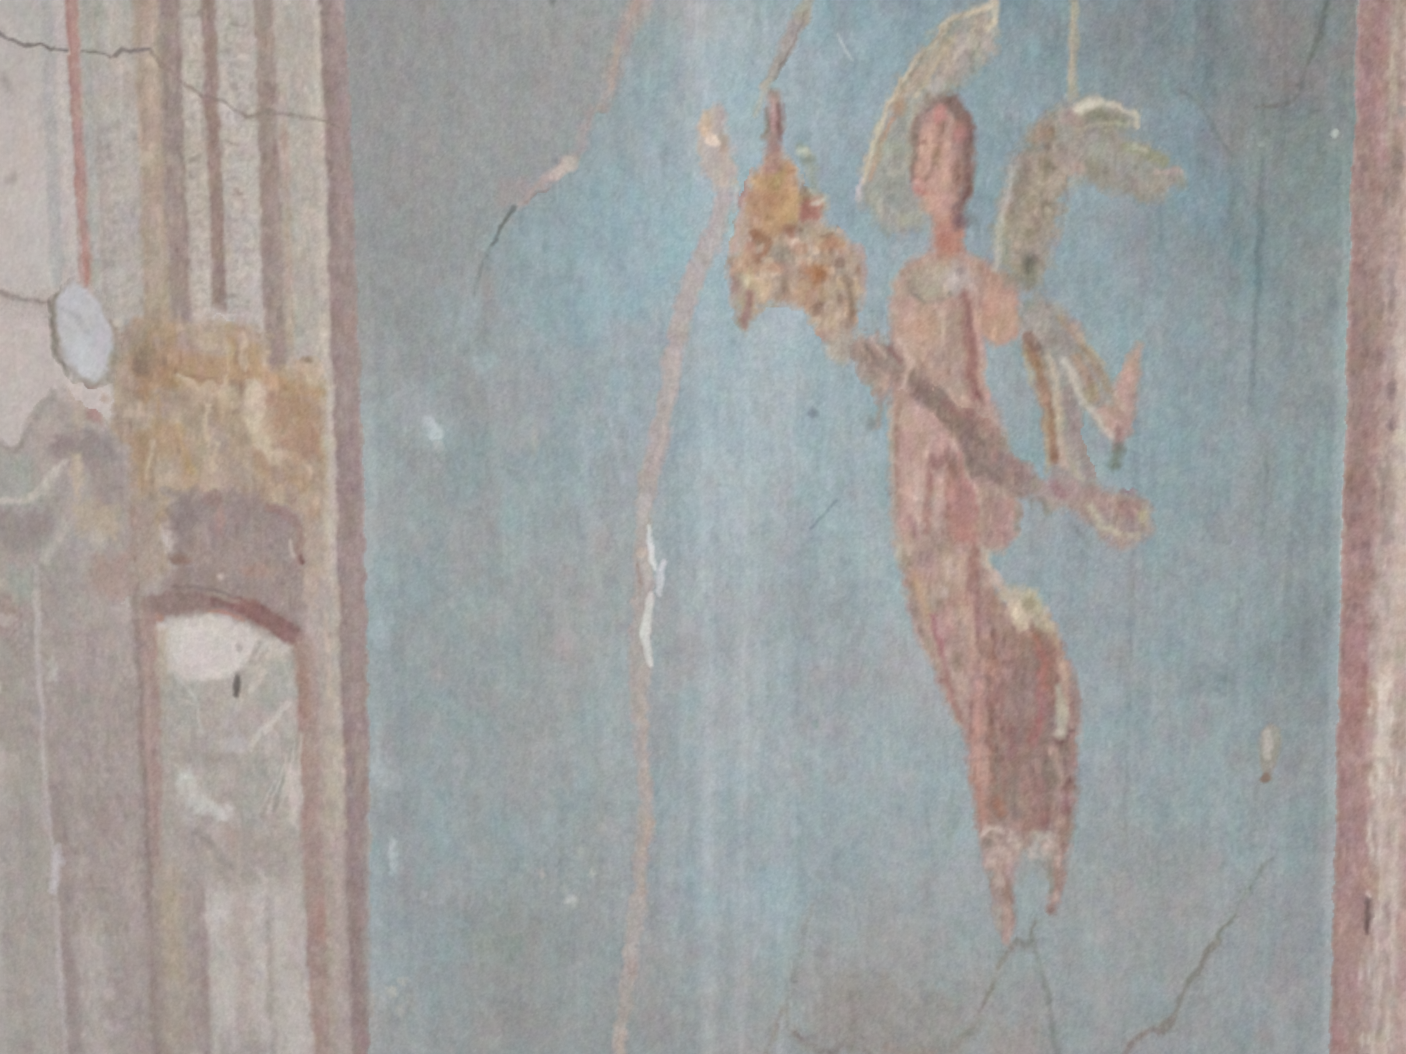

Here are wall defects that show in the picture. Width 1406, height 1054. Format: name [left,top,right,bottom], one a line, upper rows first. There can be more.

crack [0,28,351,131]
crack [0,281,57,327]
crack [756,897,883,1054]
crack [966,913,1066,1054]
crack [1118,850,1280,1054]